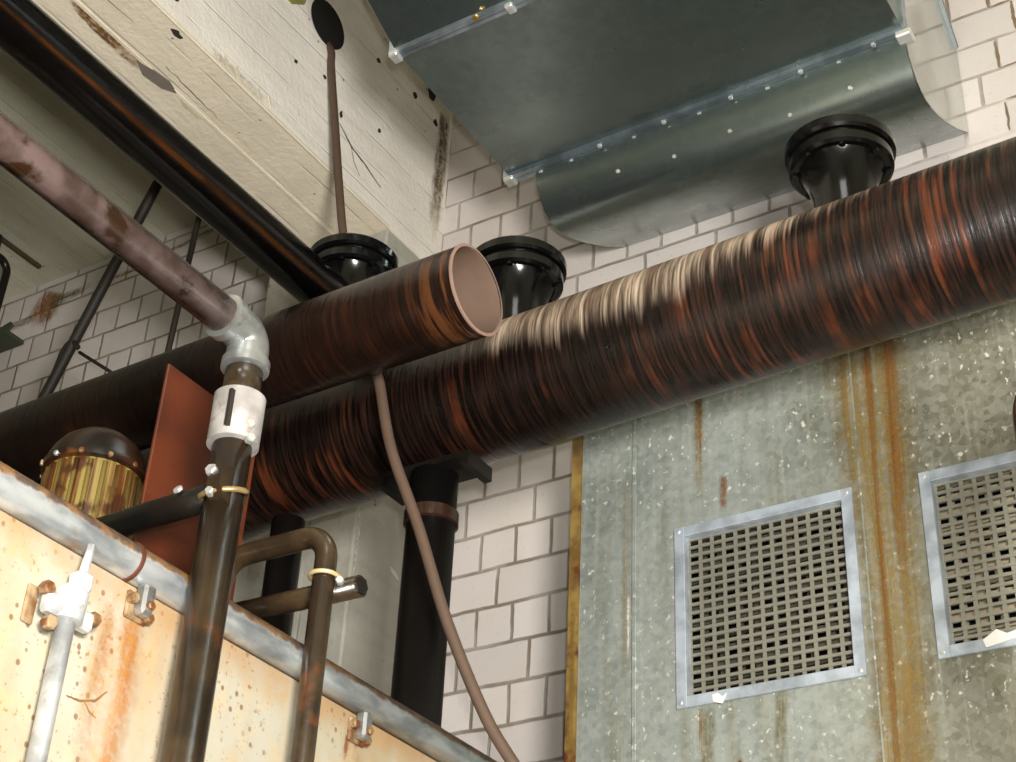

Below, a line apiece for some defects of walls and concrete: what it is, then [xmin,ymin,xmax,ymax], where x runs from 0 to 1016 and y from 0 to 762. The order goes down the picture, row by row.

water stain [434,115,448,210]
corrosion [824,339,931,762]